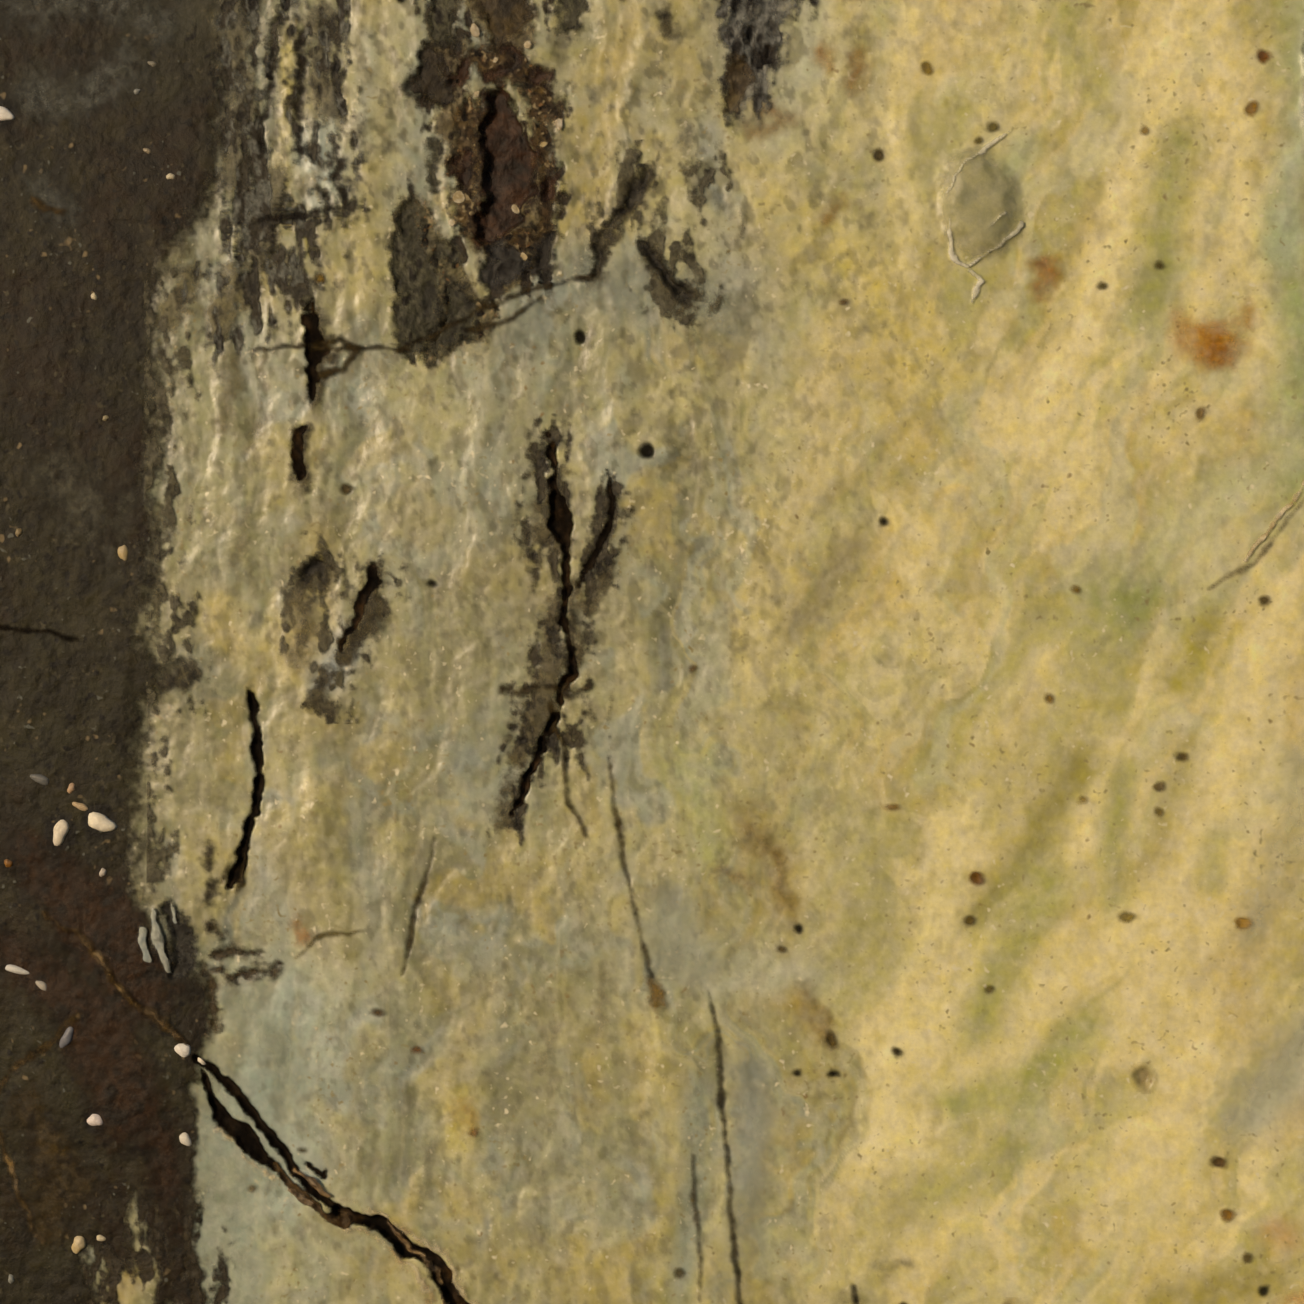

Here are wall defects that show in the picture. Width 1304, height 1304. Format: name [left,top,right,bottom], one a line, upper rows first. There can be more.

spalling [387,0,595,367]
peeling [715,0,818,126]
corrosion [1184,325,1235,365]
leakage [0,0,230,1304]
crack [488,413,664,1007]
crack [1213,480,1304,586]
crack [42,912,475,1304]
crack [691,1005,742,1304]